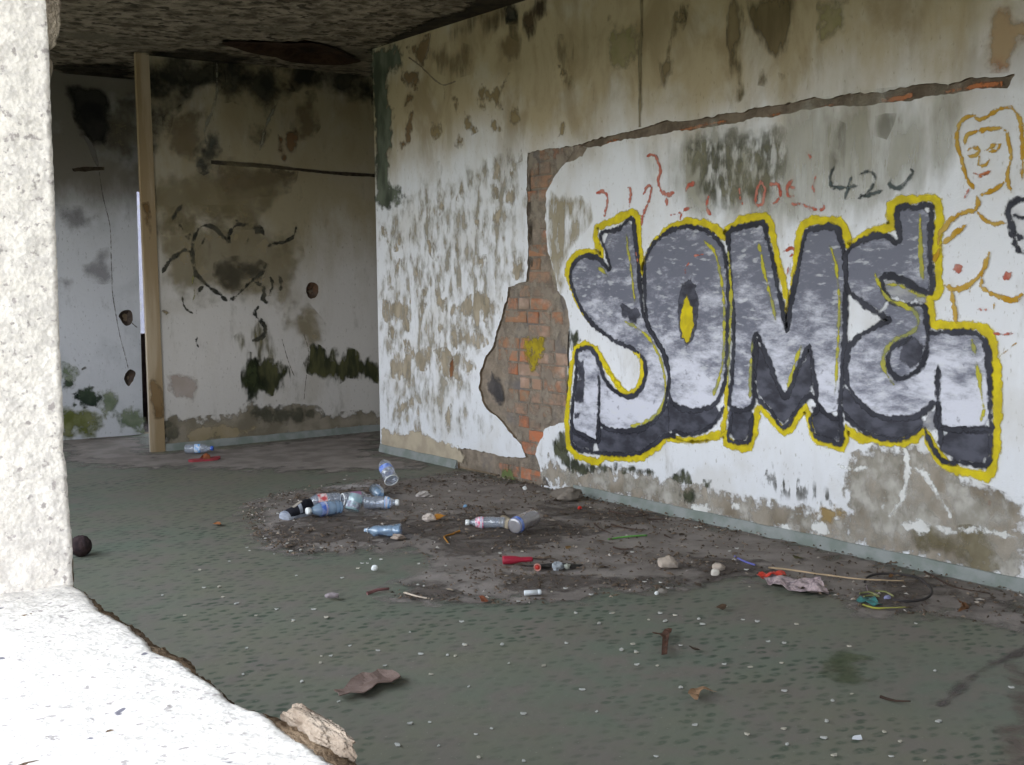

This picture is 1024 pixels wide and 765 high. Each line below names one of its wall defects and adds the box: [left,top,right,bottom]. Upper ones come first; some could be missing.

water stain [54,65,134,154]
spalling [221,40,361,65]
water stain [143,0,544,298]
water stain [610,0,643,127]
water stain [726,0,791,72]
flaking render [878,93,913,103]
flaking render [945,81,1003,93]
flaking render [381,146,587,486]
water stain [541,443,1024,577]